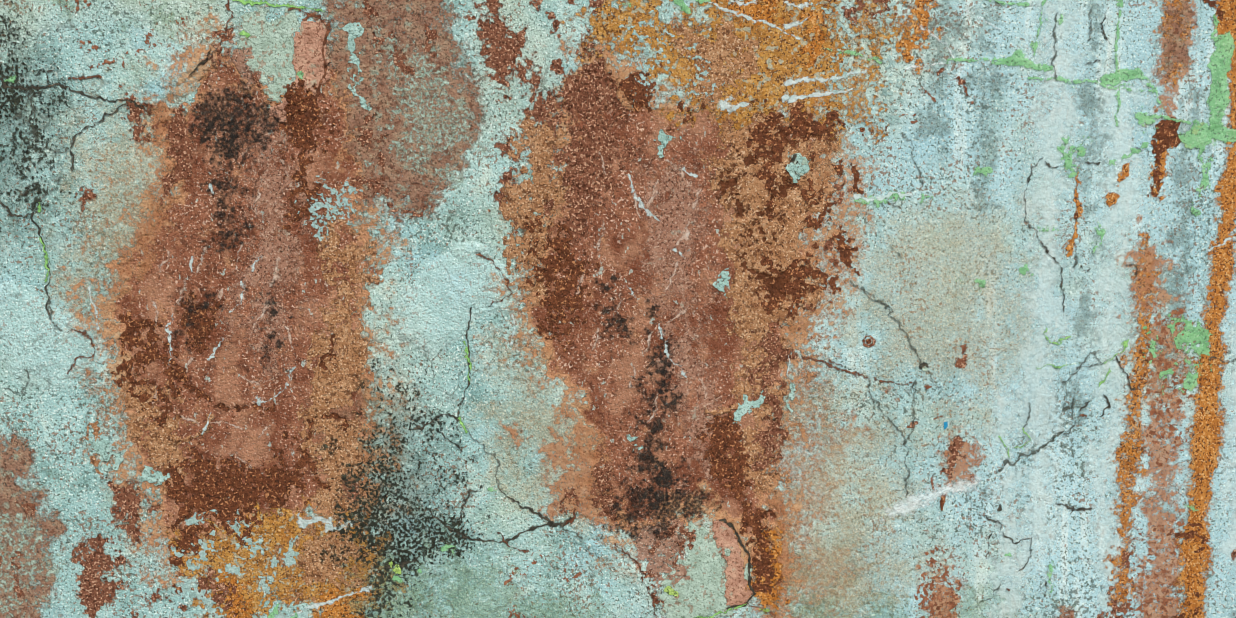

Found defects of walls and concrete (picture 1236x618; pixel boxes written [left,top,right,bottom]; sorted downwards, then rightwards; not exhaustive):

rust [560,0,974,153]
crack [0,70,151,374]
rust [75,187,97,212]
rust [111,100,184,293]
rust [1062,172,1083,257]
rust [1097,0,1236,618]
crack [414,253,582,553]
rust [499,400,626,525]
rust [160,494,409,618]
rust [504,554,584,589]
crack [614,543,775,618]
rust [914,545,968,618]